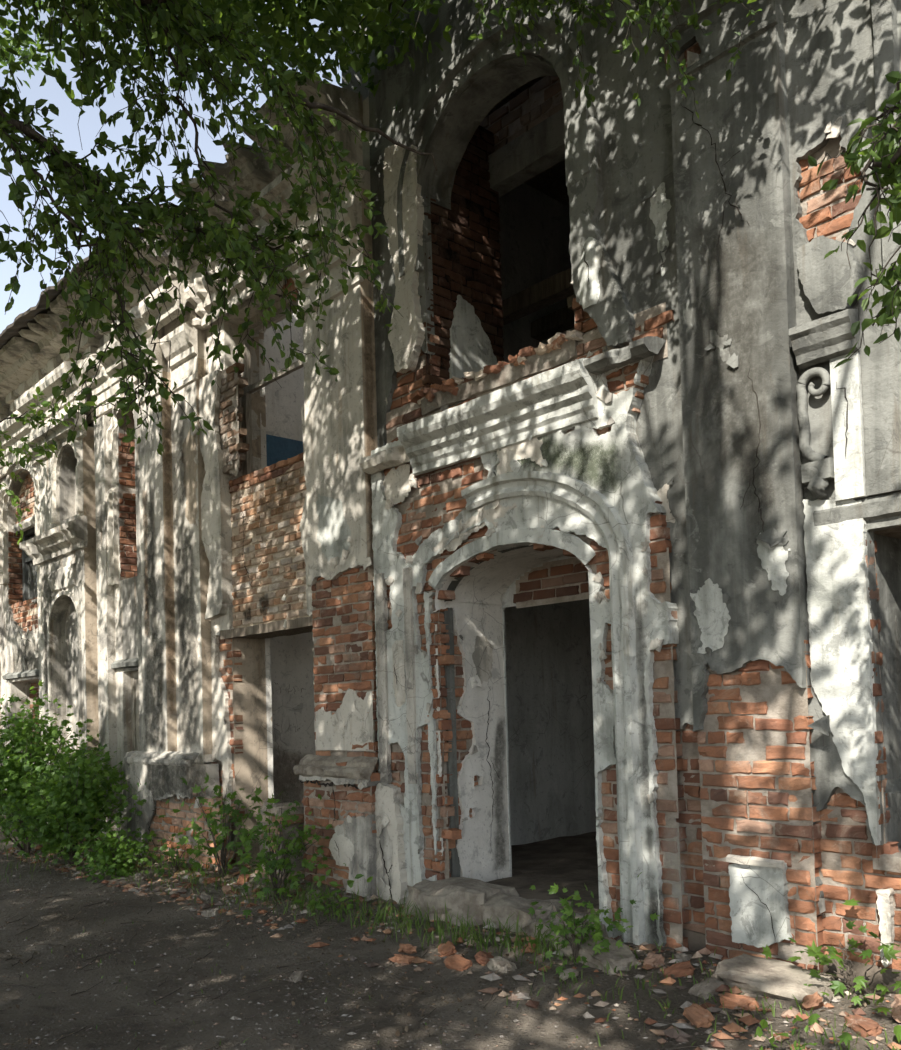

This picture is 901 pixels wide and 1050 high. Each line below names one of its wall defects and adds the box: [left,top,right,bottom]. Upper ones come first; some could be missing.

spalling [579,305,598,334]
spalling [385,334,449,411]
spalling [596,417,616,436]
spalling [597,363,649,413]
crack [836,382,848,457]
spalling [641,477,678,619]
peeling [756,528,790,596]
spalling [302,435,548,889]
spalling [643,578,901,977]
spalling [600,764,621,927]
spalling [800,991,824,1011]